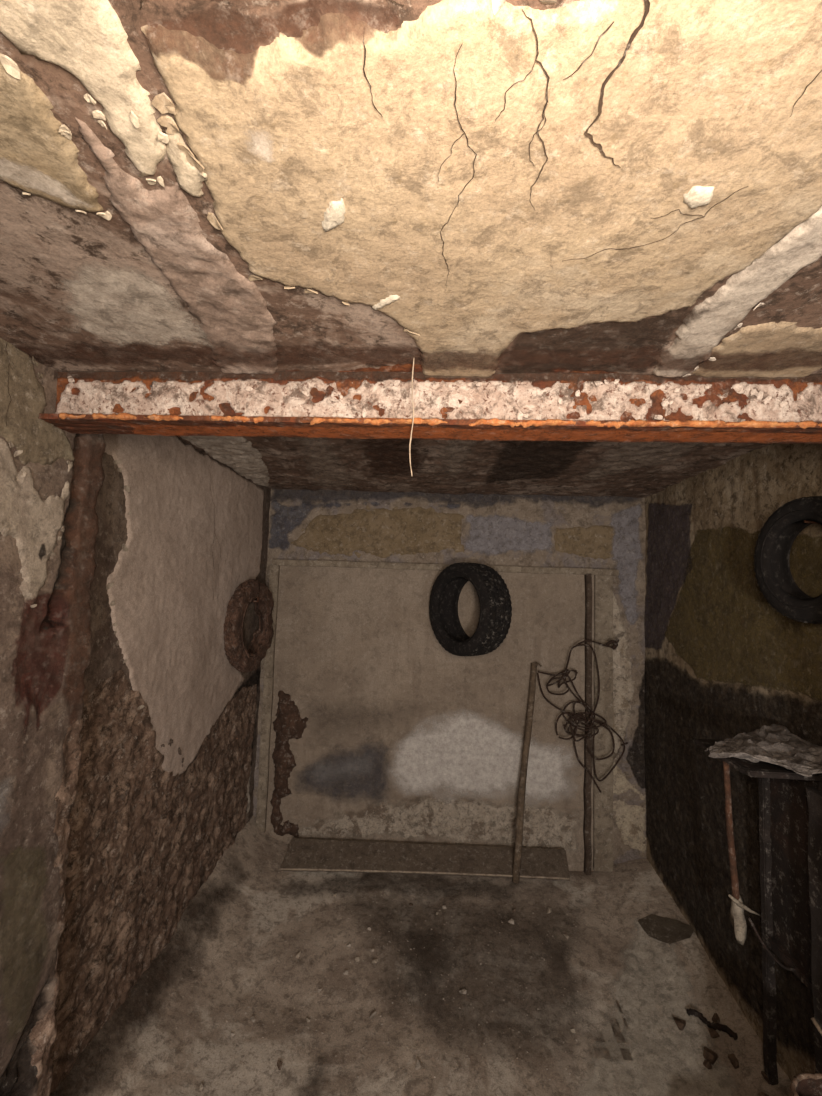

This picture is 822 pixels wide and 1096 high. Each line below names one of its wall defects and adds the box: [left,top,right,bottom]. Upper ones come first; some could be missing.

crack [438,45,477,291]
crack [495,0,650,210]
peeling [0,0,822,608]
leakage [270,437,637,507]
corrosion [130,425,822,443]
leakage [585,442,696,479]
corrosion [12,590,69,728]
peeling [613,593,636,758]
peeling [644,503,822,700]
spalling [0,434,465,1096]
corrosion [270,690,308,837]
spalling [299,798,578,850]